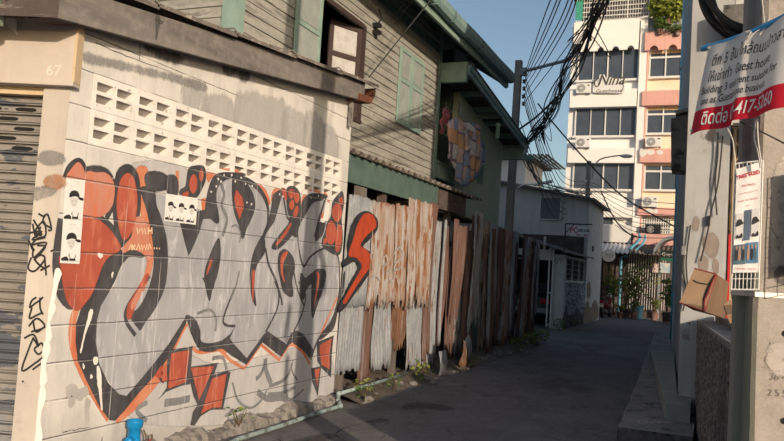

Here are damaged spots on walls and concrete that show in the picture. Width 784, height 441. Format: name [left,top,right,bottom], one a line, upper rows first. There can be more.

leakage [144,16,184,64]
leakage [83,53,338,158]